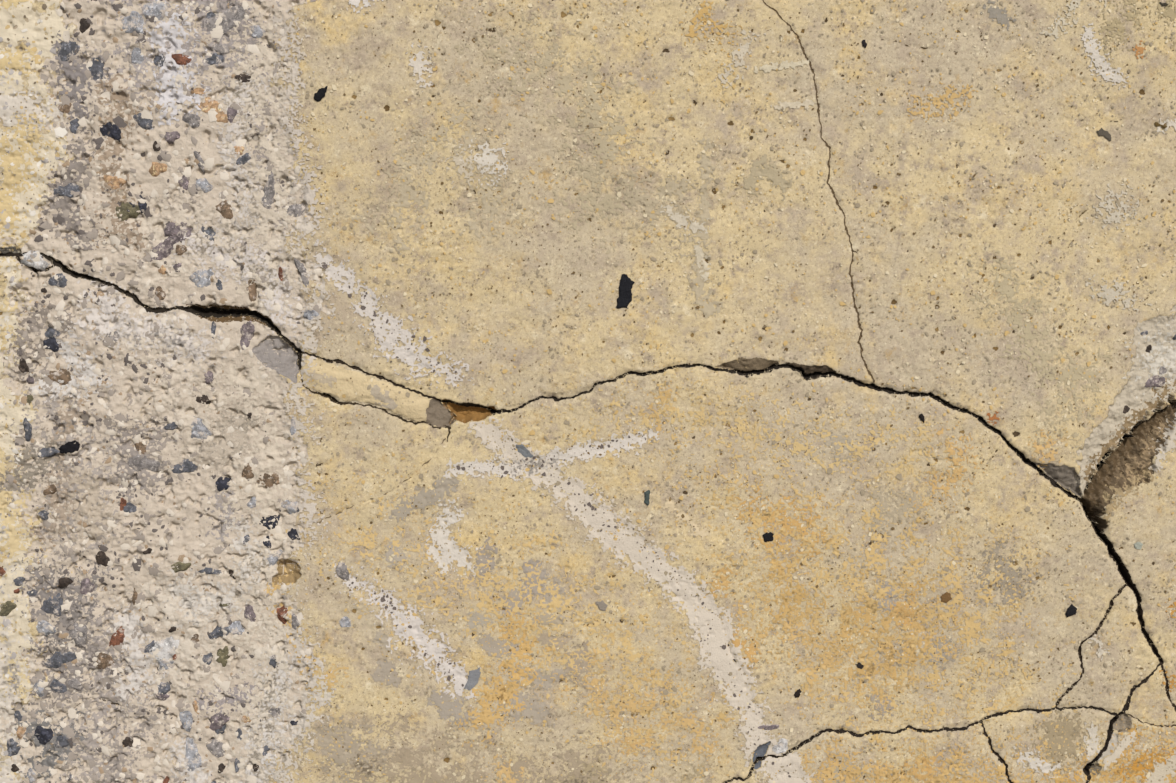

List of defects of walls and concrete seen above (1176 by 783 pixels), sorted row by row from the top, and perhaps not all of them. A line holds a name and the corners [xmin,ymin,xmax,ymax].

crack [763,0,875,382]
crack [0,252,1176,783]
spalling [1035,304,1176,532]